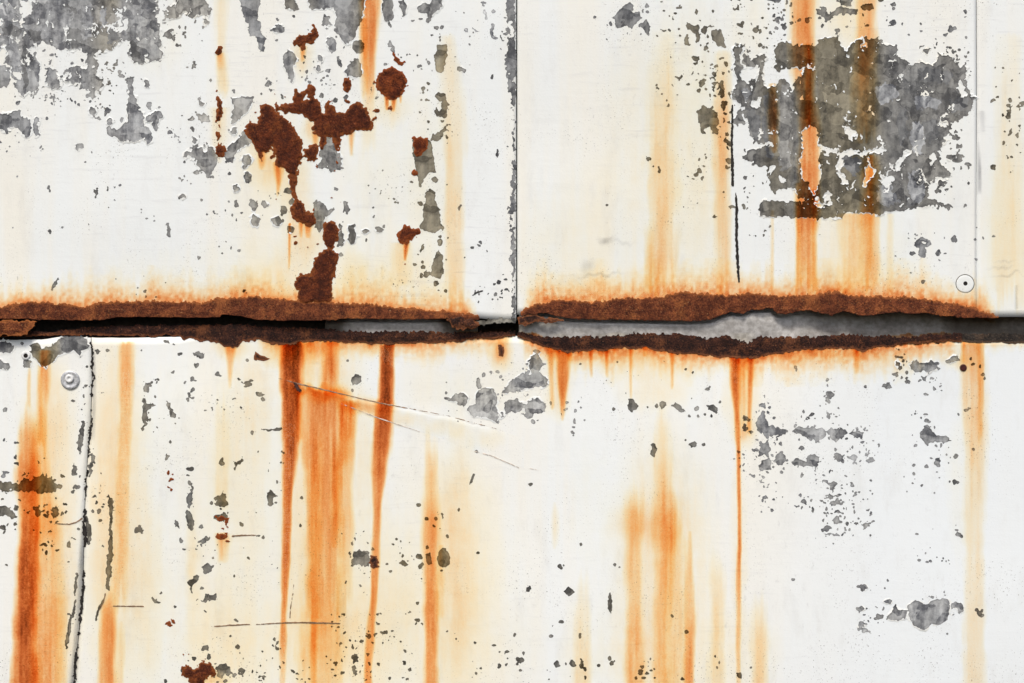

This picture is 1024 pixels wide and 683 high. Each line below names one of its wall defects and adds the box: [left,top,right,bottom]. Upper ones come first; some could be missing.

peeling [0,0,366,234]
peeling [606,0,1024,237]
peeling [313,187,385,256]
corrosion [0,52,1024,565]
peeling [444,349,585,436]
peeling [612,393,721,420]
peeling [733,378,880,548]
peeling [903,410,959,492]
corrosion [17,516,37,683]
peeling [856,579,984,636]